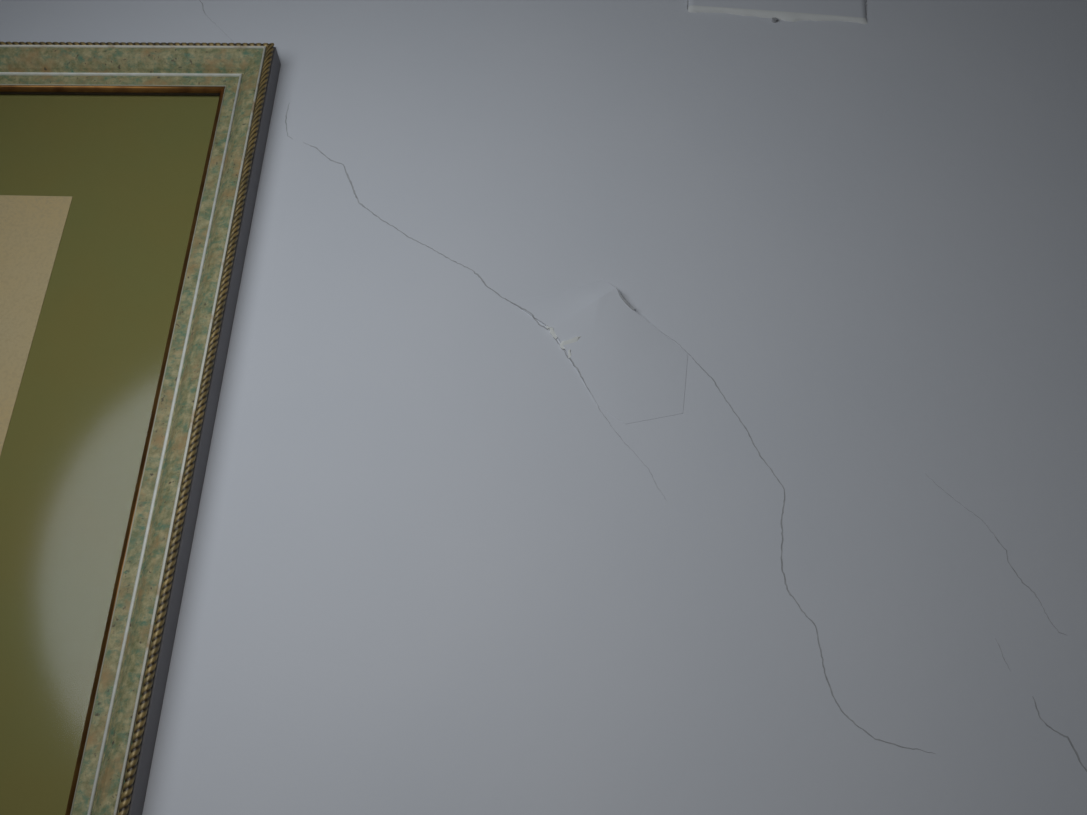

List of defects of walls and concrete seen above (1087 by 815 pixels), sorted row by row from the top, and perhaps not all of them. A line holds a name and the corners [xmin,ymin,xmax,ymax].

crack [285,105,666,500]
crack [663,333,935,754]
crack [1032,696,1087,772]